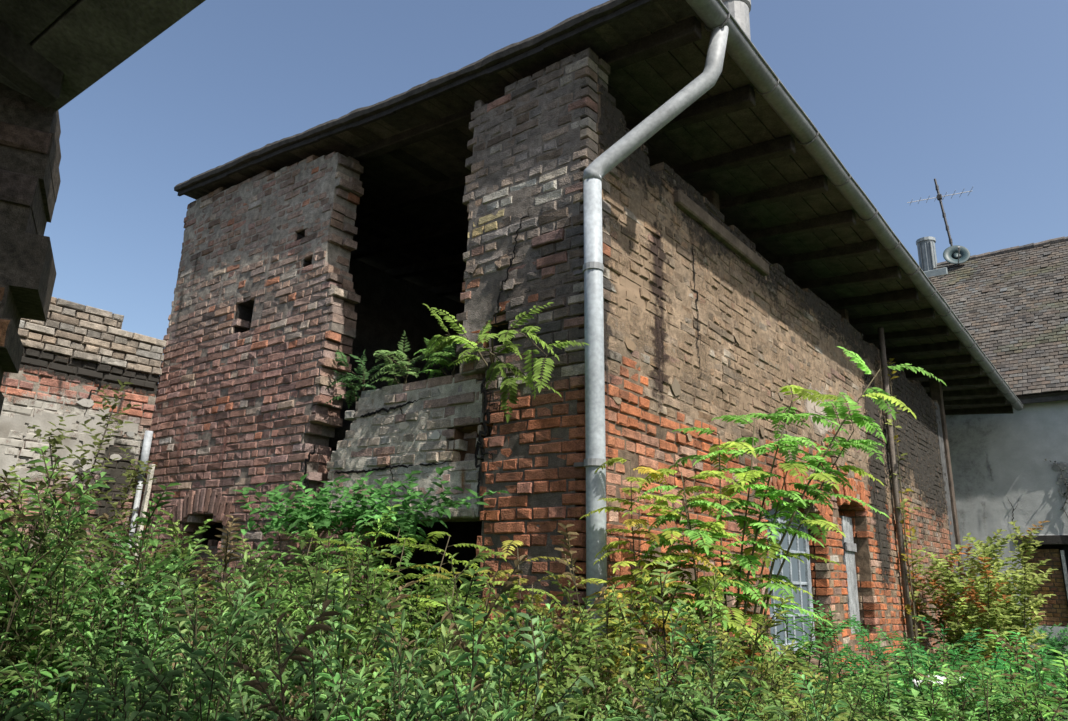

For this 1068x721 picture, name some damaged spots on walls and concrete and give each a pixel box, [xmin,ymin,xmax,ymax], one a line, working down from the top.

crack [334,206,533,507]
crack [291,445,315,526]
leakage [863,361,957,590]